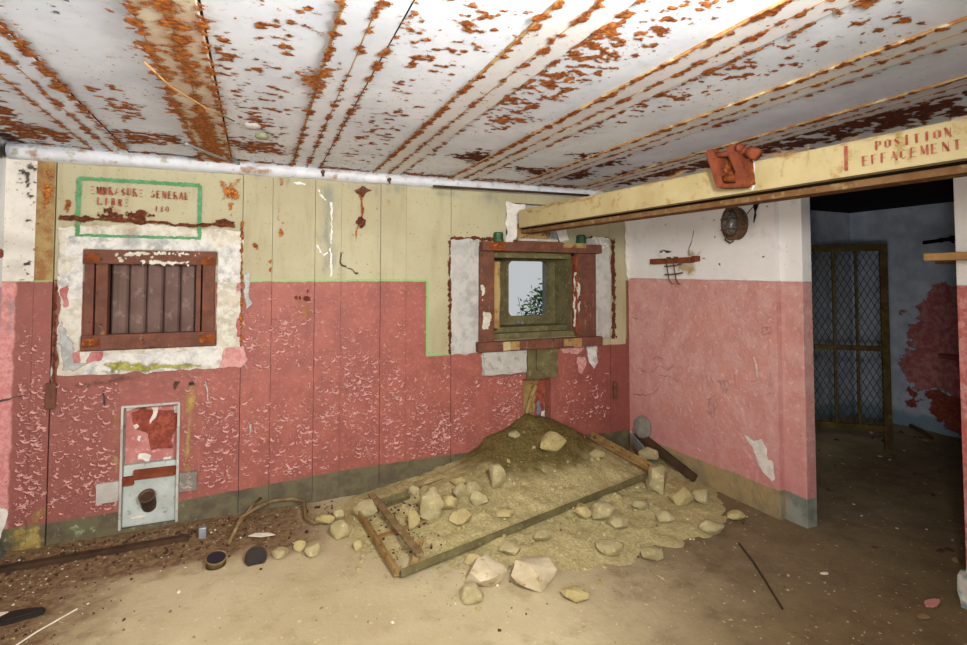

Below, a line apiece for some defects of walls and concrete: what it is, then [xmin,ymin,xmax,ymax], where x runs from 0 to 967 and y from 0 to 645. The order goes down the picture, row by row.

rust [0,0,967,354]
flaking render [0,223,522,538]
peeling [744,435,775,481]
peeling [897,281,962,436]